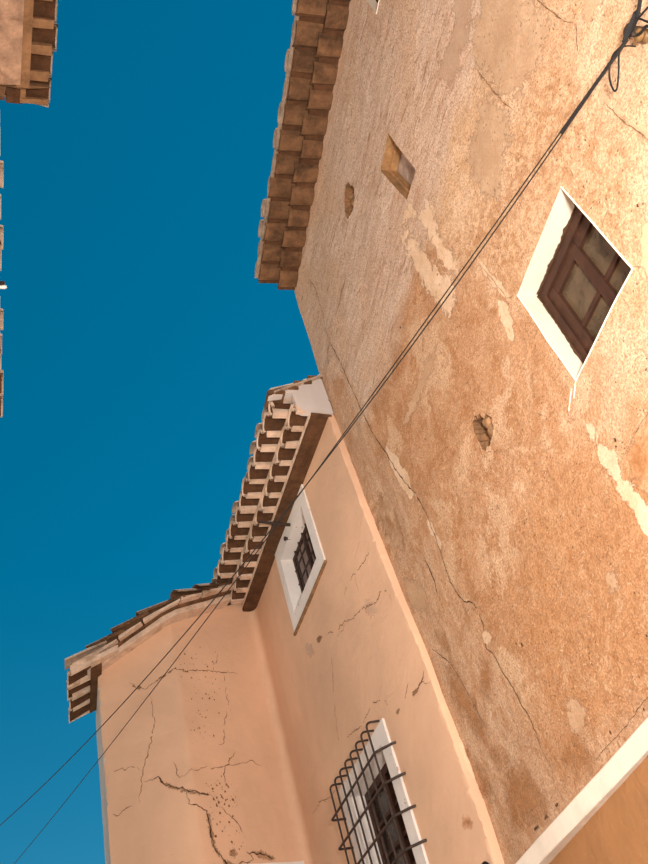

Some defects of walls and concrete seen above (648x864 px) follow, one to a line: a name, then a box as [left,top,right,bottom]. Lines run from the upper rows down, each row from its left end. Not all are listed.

spalling [344,179,357,221]
flaking render [398,193,460,323]
spalling [471,412,494,458]
flaking render [623,415,648,504]
crack [310,281,560,793]
crack [113,661,273,864]